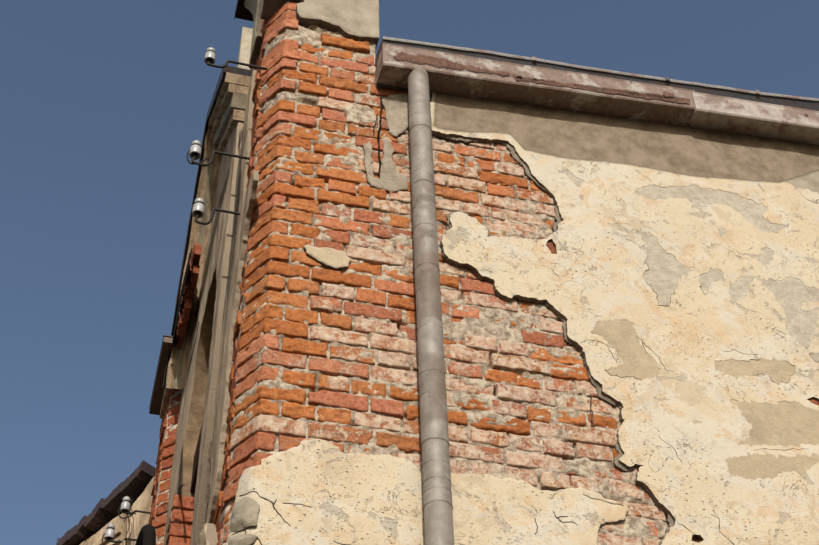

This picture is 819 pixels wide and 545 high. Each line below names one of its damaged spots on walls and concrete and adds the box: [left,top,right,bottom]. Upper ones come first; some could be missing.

spalling [171,243,202,350]
spalling [213,1,422,545]
spalling [432,136,668,545]
peeling [715,358,796,384]
spalling [148,389,194,545]
crack [242,491,312,526]
peeling [725,398,819,480]